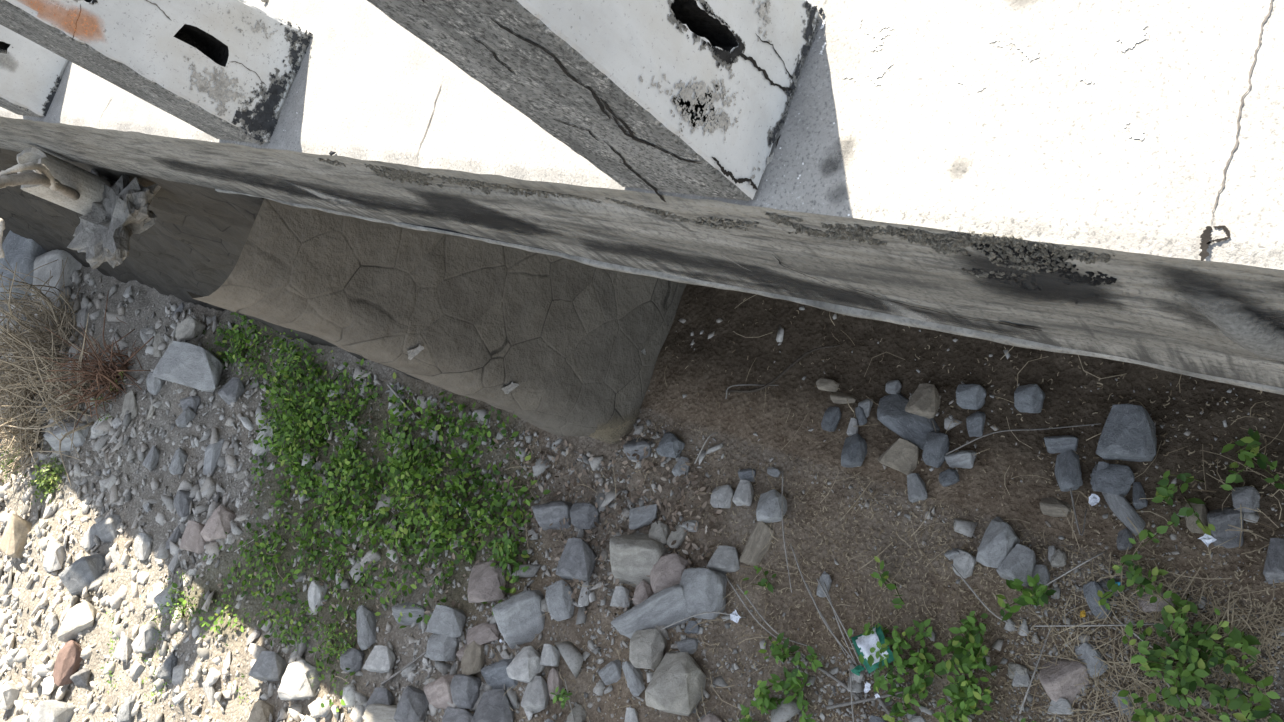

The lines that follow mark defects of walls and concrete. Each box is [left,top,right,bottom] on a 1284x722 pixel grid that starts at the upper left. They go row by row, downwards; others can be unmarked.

corrosion [26,0,99,36]
peeling [639,0,772,140]
crack [741,33,794,91]
crack [1199,0,1272,261]
leakage [584,242,1015,335]
leakage [965,255,1113,306]
leakage [1165,271,1284,329]